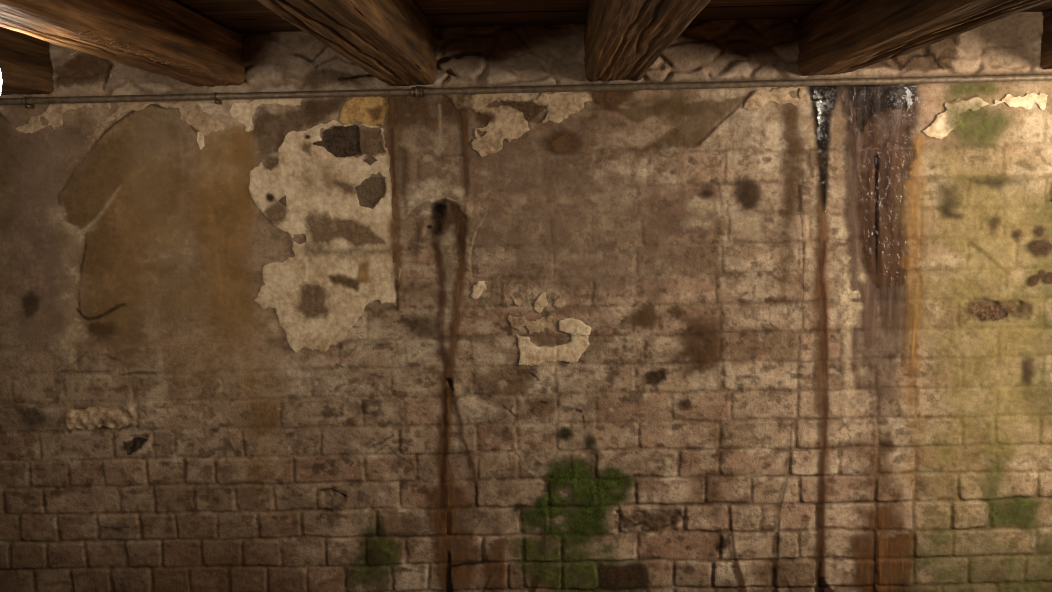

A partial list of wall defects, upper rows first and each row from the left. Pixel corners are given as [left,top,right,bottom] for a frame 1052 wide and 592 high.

flaking render [450,92,593,157]
peeling [0,98,302,367]
flaking render [249,96,402,353]
rust [905,136,922,363]
damp [1014,227,1052,256]
rust [430,215,478,592]
flaking render [508,292,592,366]
damp [784,84,920,592]
damp [598,563,650,591]
crack [728,511,747,592]
crack [775,442,792,592]
crack [818,577,831,592]